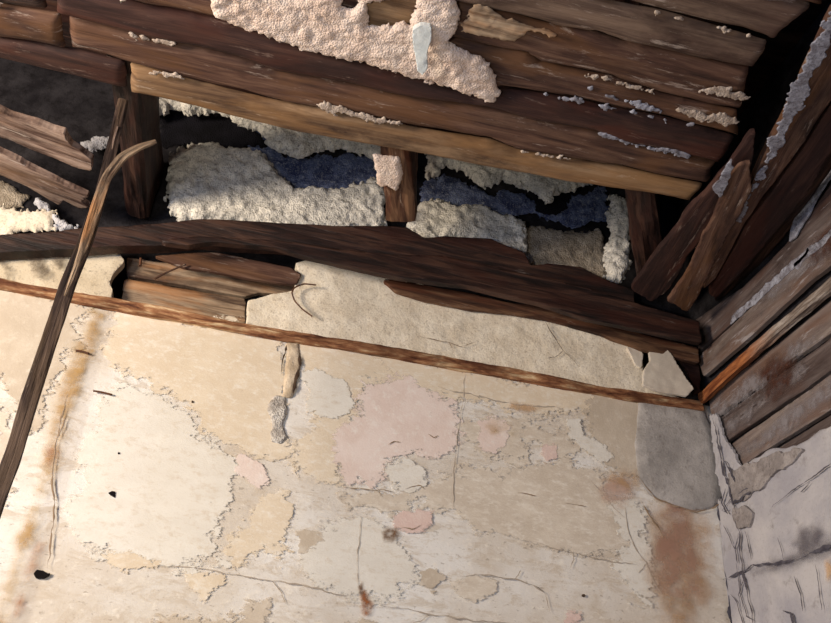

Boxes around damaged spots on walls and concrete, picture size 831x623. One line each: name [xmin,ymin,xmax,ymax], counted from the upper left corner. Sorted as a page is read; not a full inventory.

flaking render [0,257,70,289]
peeling [0,290,54,463]
peeling [29,303,94,435]
peeling [62,254,694,609]
crack [438,381,555,502]
crack [540,414,831,623]
peeling [150,597,272,623]
crack [375,606,505,623]
crack [462,570,550,612]